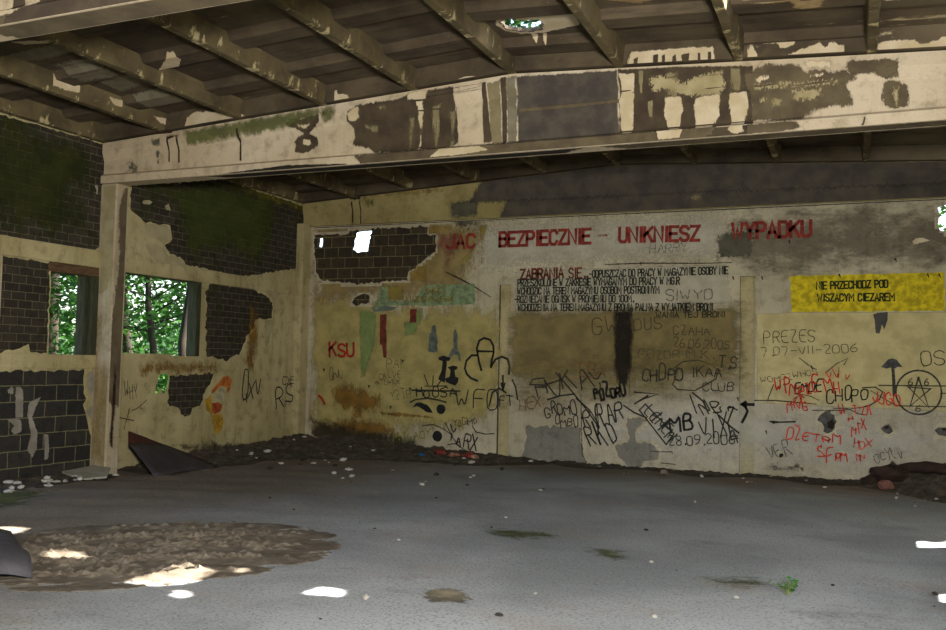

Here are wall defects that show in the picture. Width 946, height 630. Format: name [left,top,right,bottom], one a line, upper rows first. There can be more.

peeling [495,14,579,45]
peeling [185,111,245,126]
water stain [185,109,319,161]
peeling [425,146,487,159]
peeling [656,129,682,140]
flaking render [0,114,116,293]
flaking render [0,255,51,354]
flaking render [129,115,346,417]
flaking render [313,225,437,306]
flaking render [0,368,94,480]